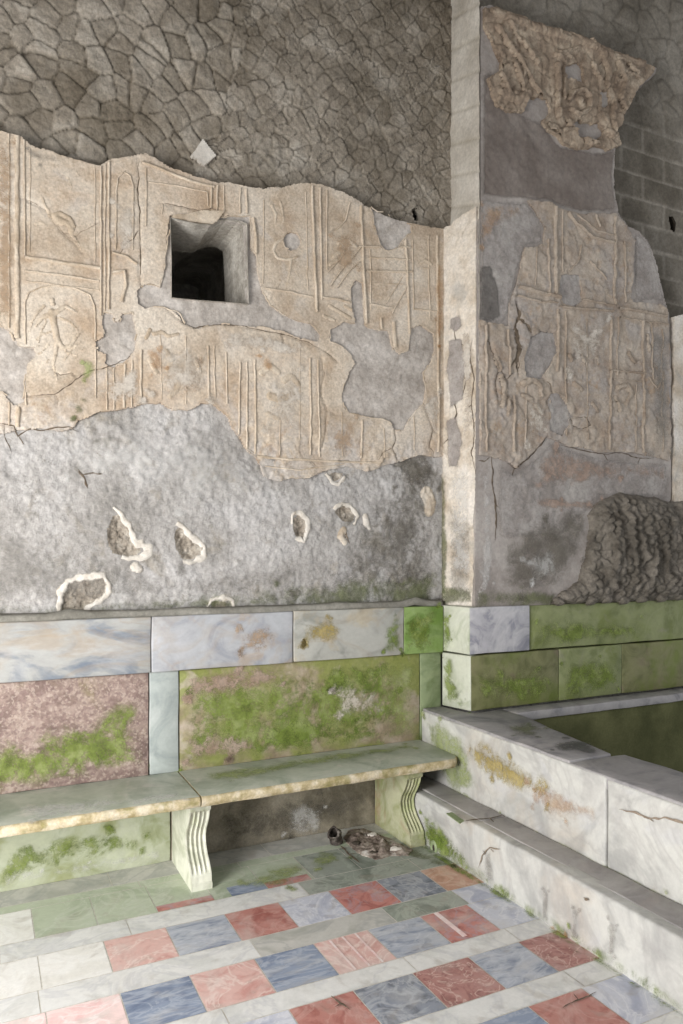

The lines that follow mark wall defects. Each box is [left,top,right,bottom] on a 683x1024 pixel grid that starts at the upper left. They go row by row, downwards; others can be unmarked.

flaking render [95,215,435,431]
crack [423,304,654,537]
spalling [107,506,153,573]
spalling [174,521,207,565]
spalling [291,510,311,543]
spalling [56,571,112,611]
spalling [207,594,235,607]
water stain [182,632,285,703]
water stain [329,687,378,719]
water stain [182,736,251,766]
water stain [469,746,550,810]
crack [620,809,683,824]